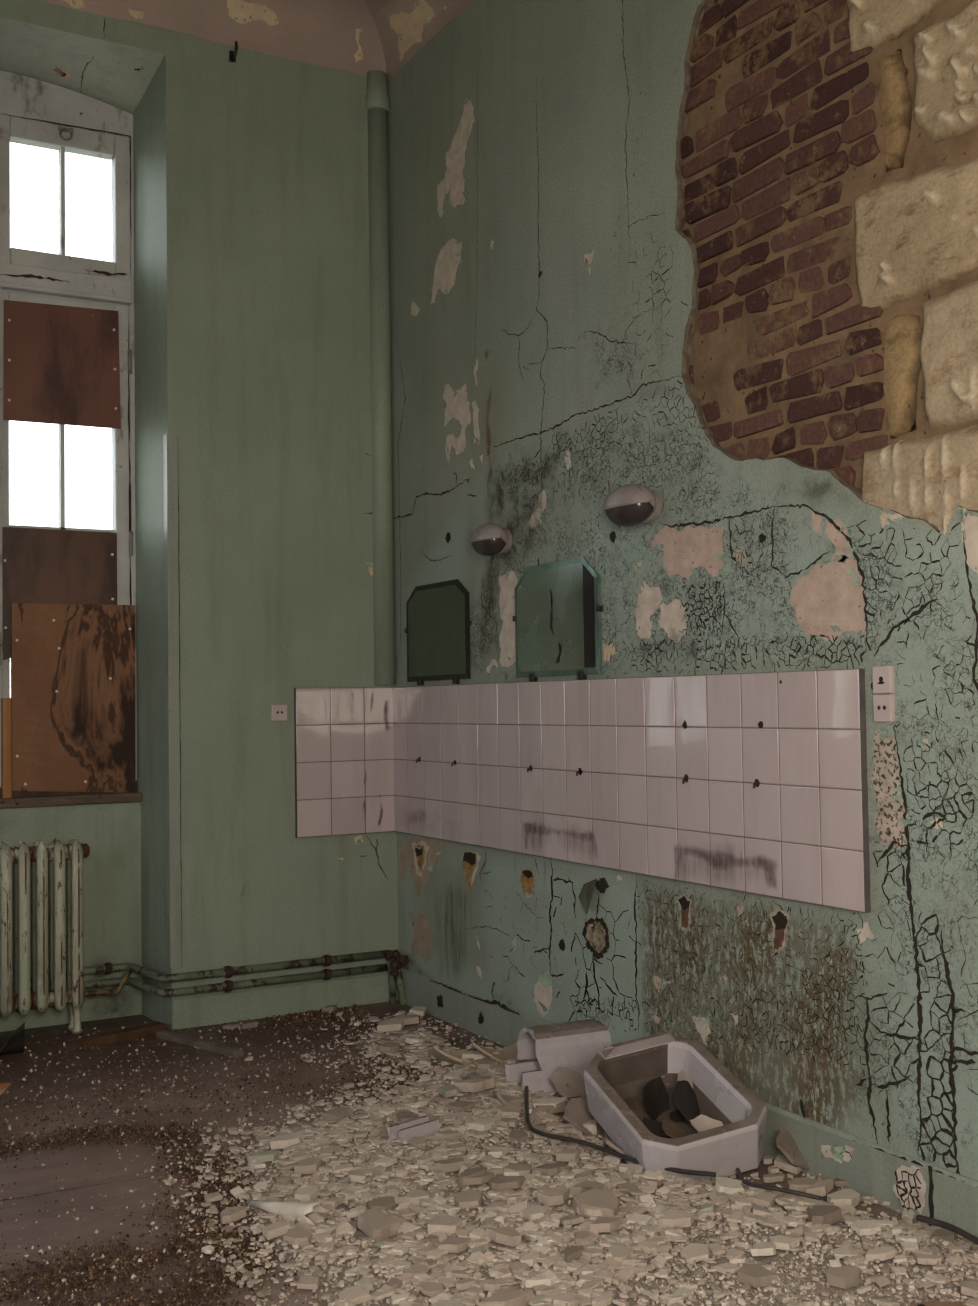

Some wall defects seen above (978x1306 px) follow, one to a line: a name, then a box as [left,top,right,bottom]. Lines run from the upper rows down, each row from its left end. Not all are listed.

peeling [389,0,447,62]
peeling [437,99,474,217]
peeling [410,238,462,316]
spalling [675,0,978,573]
peeling [442,358,483,470]
crack [364,342,476,669]
peeling [633,518,749,643]
crack [431,0,978,1182]
peeling [790,510,866,641]
peeling [602,643,616,662]
spalling [460,849,481,890]
spalling [520,867,535,898]